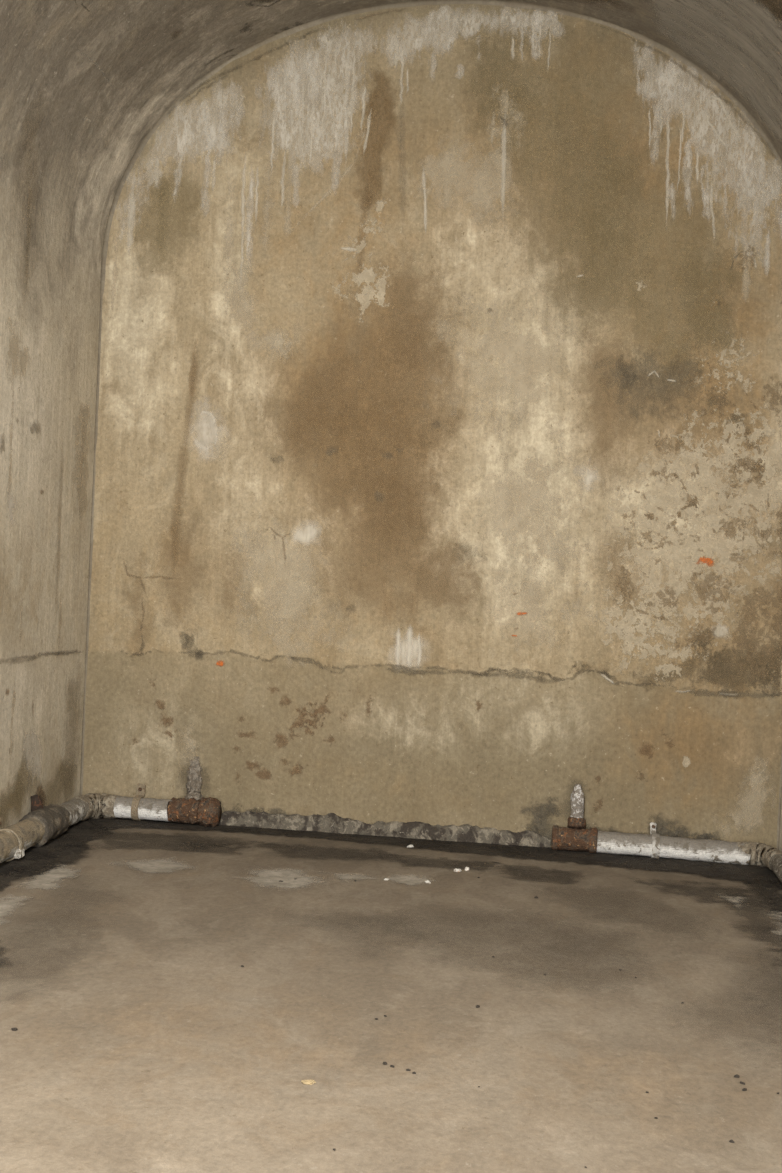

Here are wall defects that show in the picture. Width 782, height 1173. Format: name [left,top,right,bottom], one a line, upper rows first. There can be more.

water stain [149,92,233,206]
water stain [268,10,558,322]
water stain [639,55,781,226]
peeling [596,341,782,682]